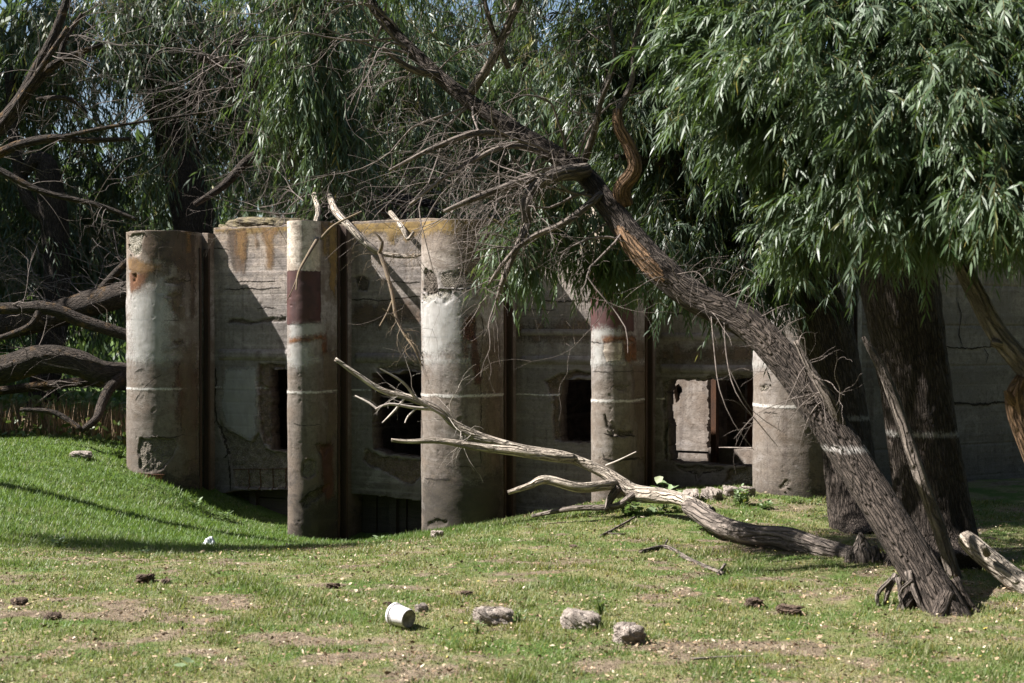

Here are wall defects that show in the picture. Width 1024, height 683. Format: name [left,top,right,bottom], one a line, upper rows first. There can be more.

rust [235,228,277,269]
rust [128,258,161,292]
spalling [421,268,472,305]
rust [290,333,327,353]
crack [954,399,1005,407]
crack [214,367,231,491]
spalling [661,374,753,485]
spalling [138,436,176,475]